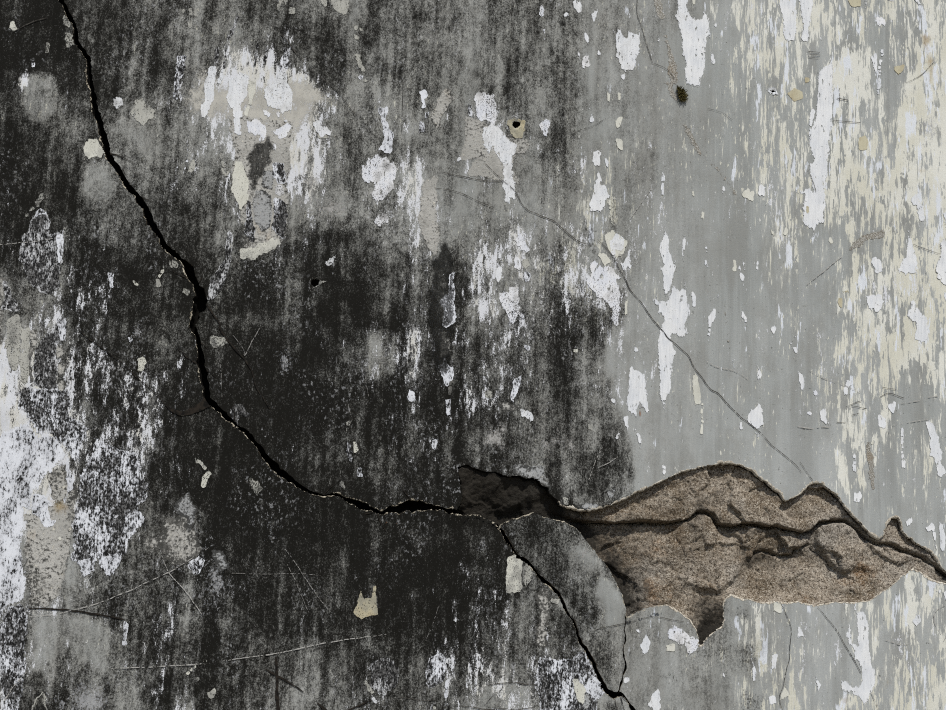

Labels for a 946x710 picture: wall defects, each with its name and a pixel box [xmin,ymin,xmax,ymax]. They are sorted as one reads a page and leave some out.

crack [13,0,464,534]
peeling [173,15,337,301]
peeling [362,106,397,227]
damp [429,243,454,374]
peeling [457,91,533,208]
peeling [587,150,633,326]
crack [437,163,813,480]
crack [28,607,123,620]
peeling [0,277,230,710]
crack [265,657,371,710]
crack [495,524,684,710]
spalling [456,460,946,710]